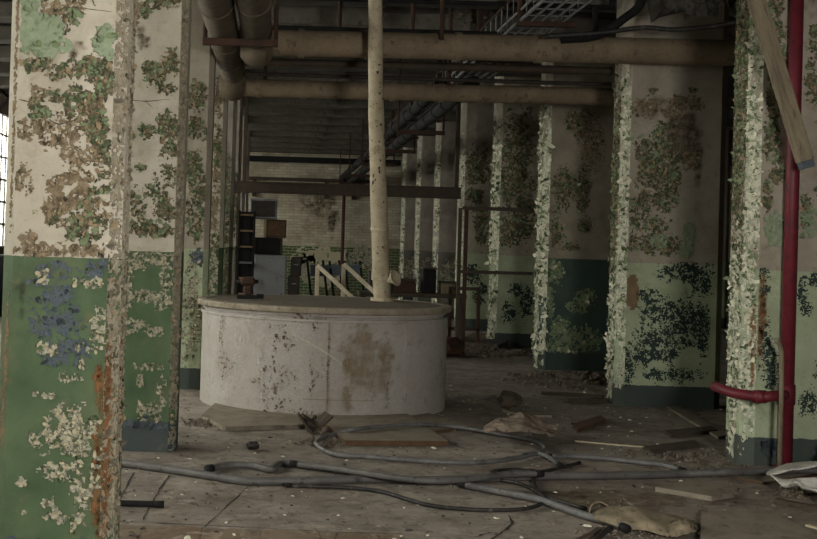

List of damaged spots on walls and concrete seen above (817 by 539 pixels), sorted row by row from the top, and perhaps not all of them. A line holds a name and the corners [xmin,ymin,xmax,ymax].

peeling [767,0,789,68]
peeling [803,24,817,106]
peeling [9,0,239,539]
peeling [398,0,785,459]
peeling [797,272,817,317]
peeling [798,186,817,239]
peeling [798,360,817,419]
corrosion [91,343,113,536]